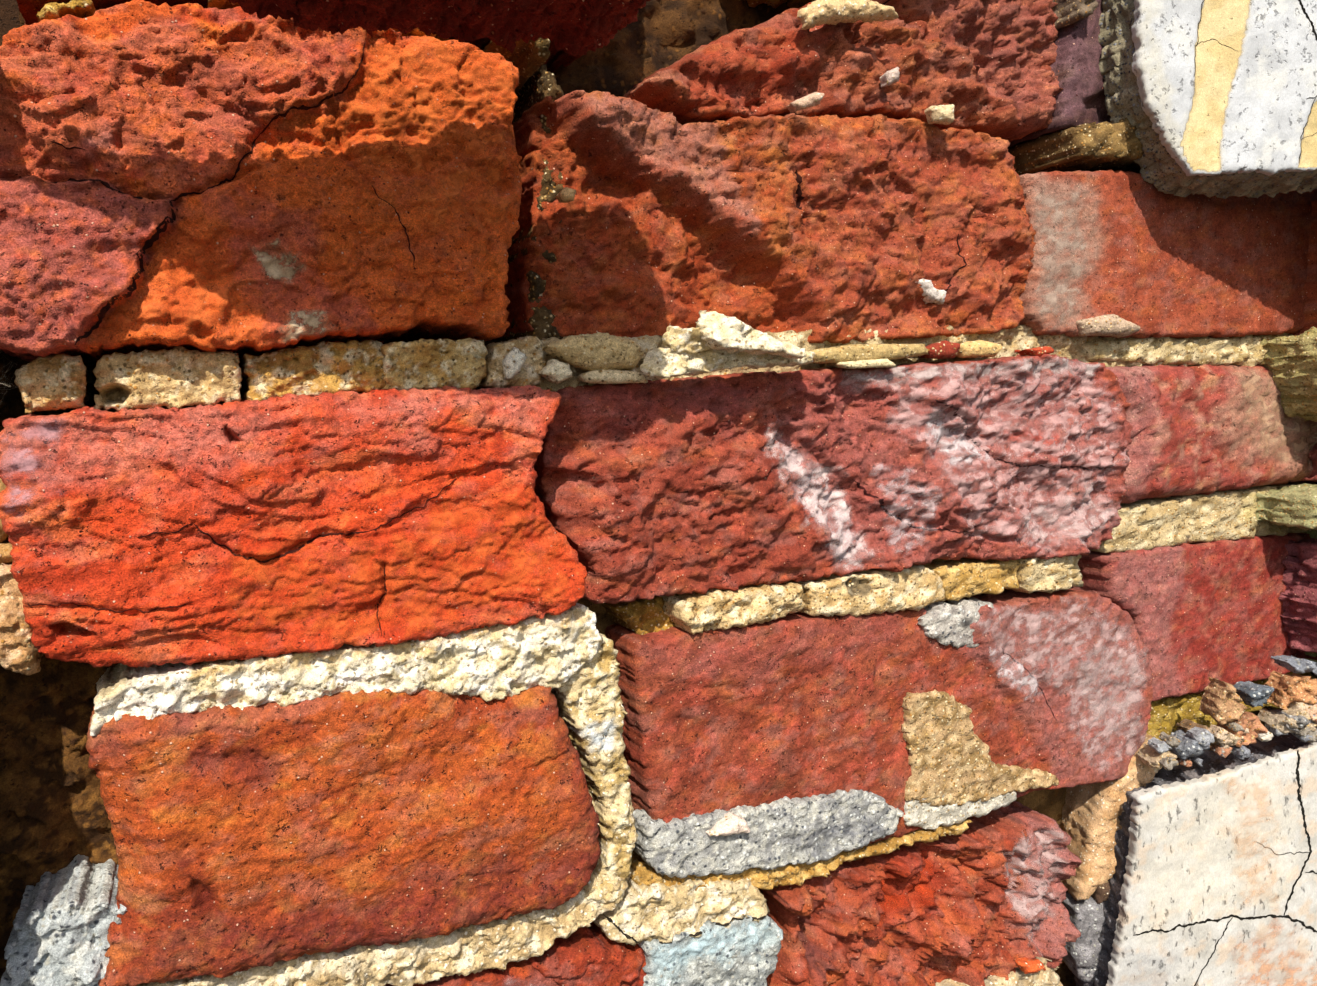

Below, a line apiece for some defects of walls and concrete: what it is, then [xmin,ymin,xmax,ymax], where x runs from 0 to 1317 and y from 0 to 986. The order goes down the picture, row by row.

crack [1194,0,1234,75]
crack [1299,0,1317,40]
crack [1299,96,1317,163]
water stain [841,357,1130,548]
crack [137,477,458,563]
water stain [767,433,864,566]
crack [23,602,194,613]
crack [376,563,387,635]
crack [1133,750,1317,986]